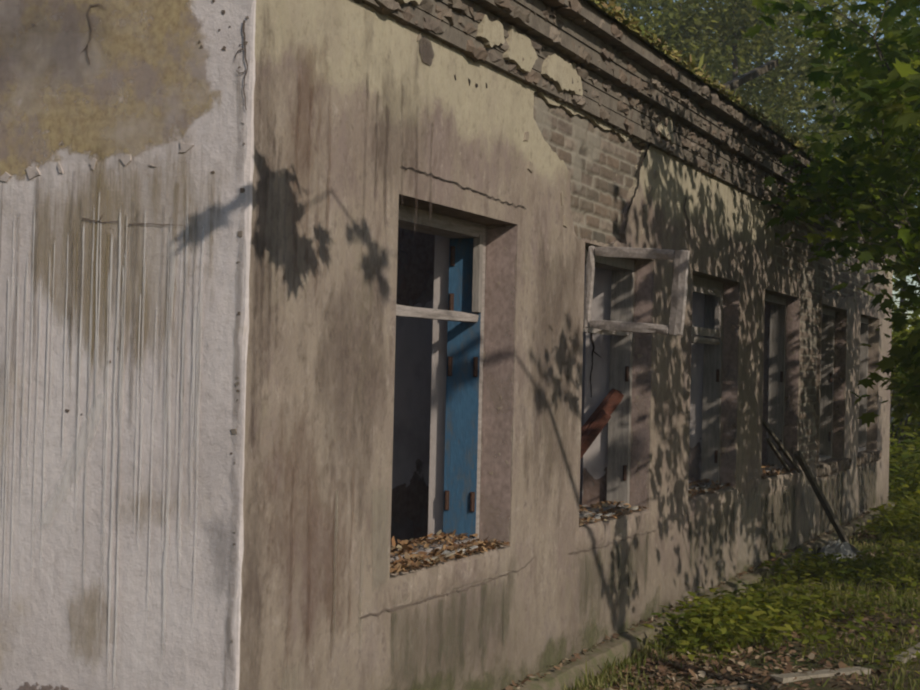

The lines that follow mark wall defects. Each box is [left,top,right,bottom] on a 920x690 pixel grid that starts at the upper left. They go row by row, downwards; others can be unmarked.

crack [81,3,105,65]
peeling [0,0,218,182]
crack [234,20,248,110]
flaking render [416,31,434,65]
flaking render [523,93,644,244]
leakage [2,162,189,678]
leakage [153,292,202,447]
flaking render [771,211,887,469]